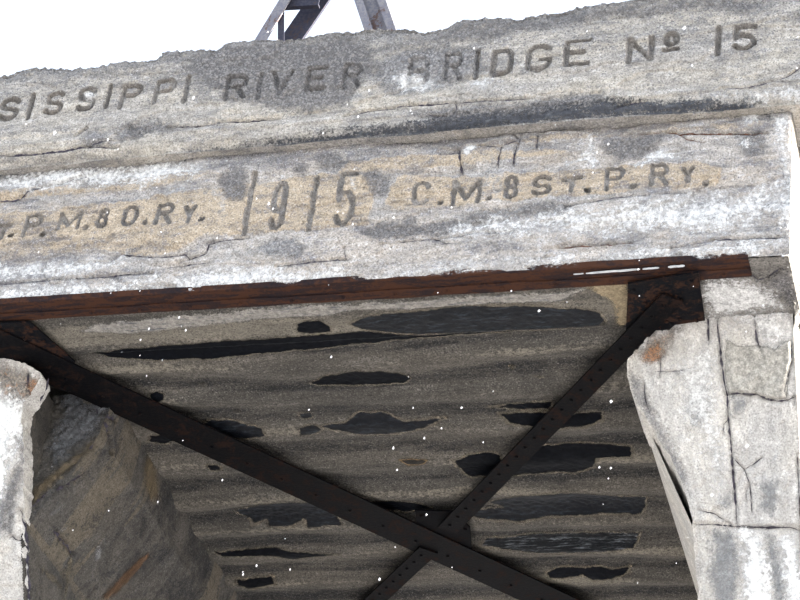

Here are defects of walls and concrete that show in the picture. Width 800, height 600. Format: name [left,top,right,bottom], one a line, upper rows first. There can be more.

crack [3,129,112,157]
crack [641,133,760,143]
rust [589,284,628,326]
rust [642,342,664,362]
crack [700,319,800,530]